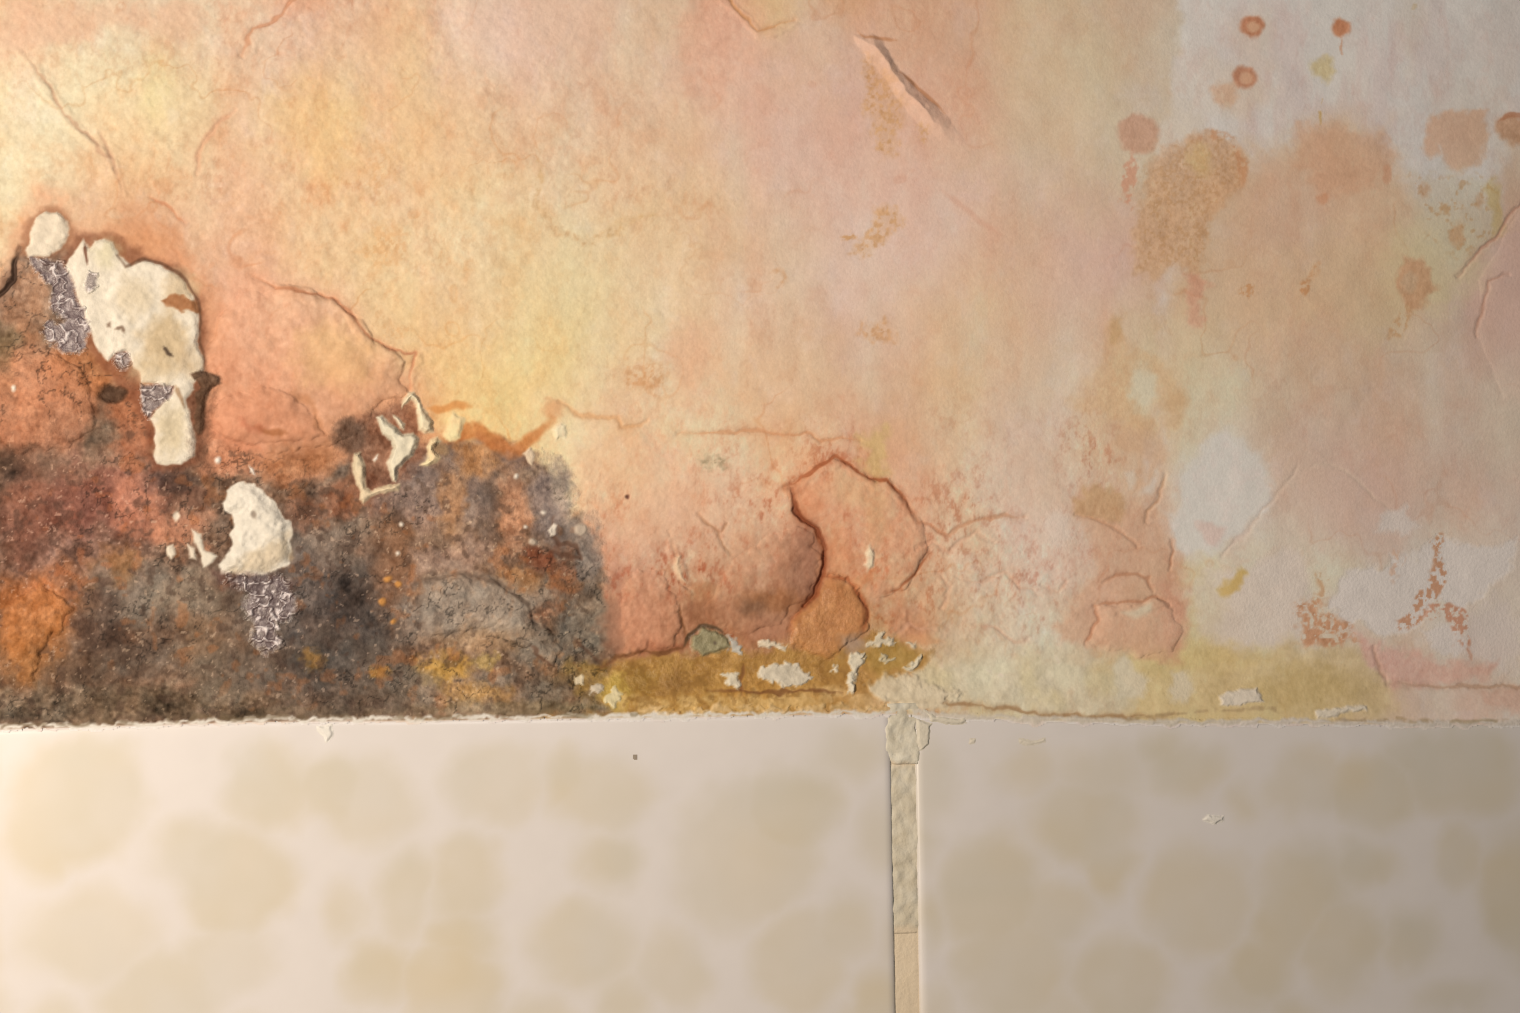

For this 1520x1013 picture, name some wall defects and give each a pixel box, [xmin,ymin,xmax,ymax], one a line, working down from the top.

crack [724,0,801,38]
corrosion [1114,0,1520,342]
spalling [17,202,296,572]
crack [242,266,424,395]
peeling [326,389,467,507]
crack [409,569,689,673]
crack [541,512,585,563]
damp [0,0,1520,723]
crack [704,661,846,698]
crack [552,396,1031,634]
crack [1082,468,1178,650]
crack [1451,197,1520,341]